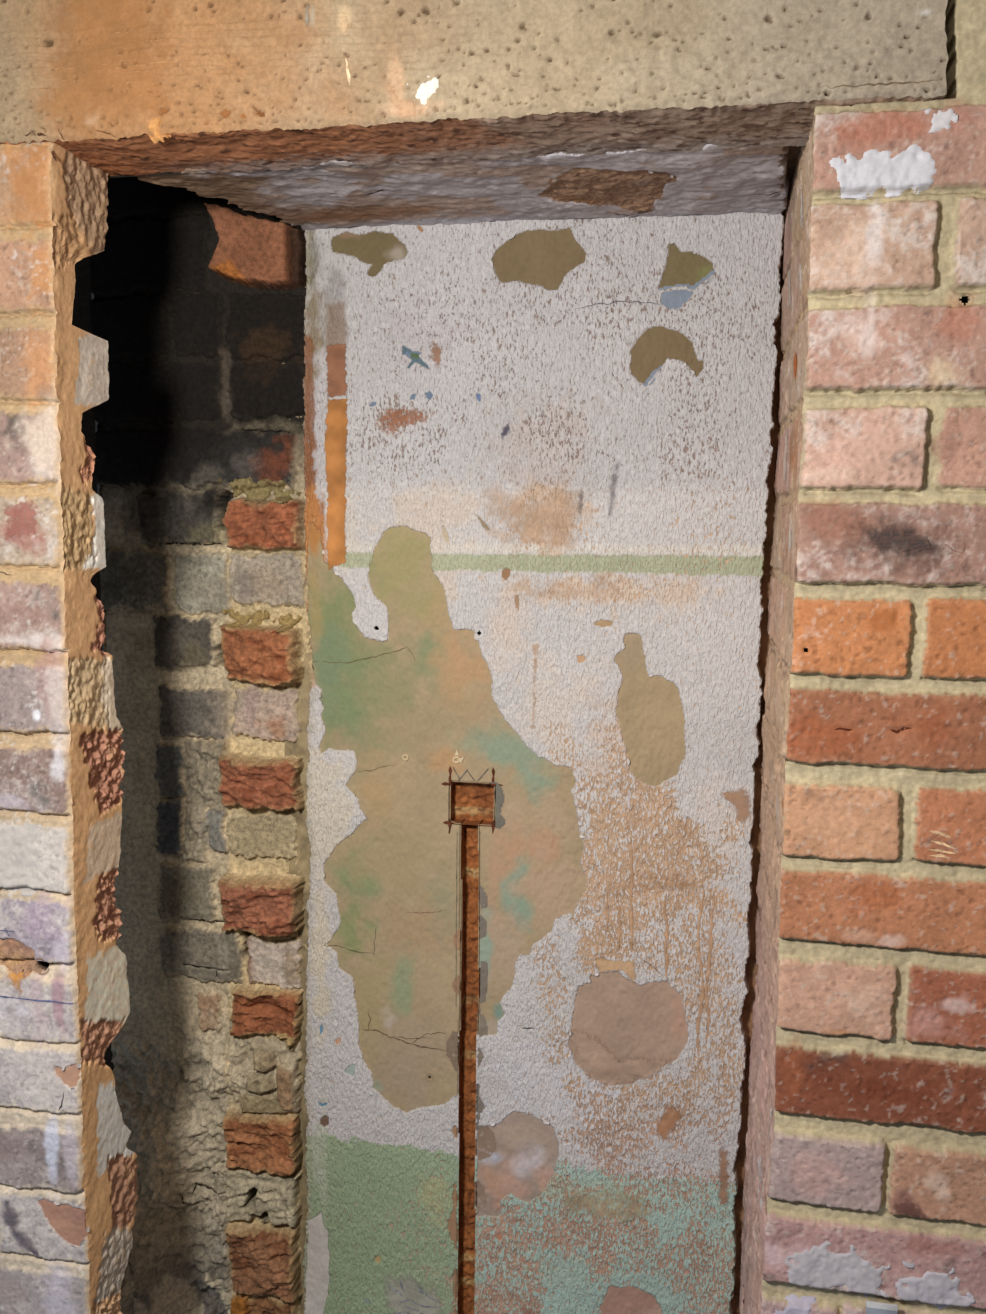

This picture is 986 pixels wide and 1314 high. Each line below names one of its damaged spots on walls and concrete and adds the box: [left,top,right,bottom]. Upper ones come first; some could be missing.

flaking render [539,168,677,212]
peeling [332,229,407,279]
peeling [490,228,586,290]
peeling [658,242,715,309]
peeling [630,326,703,387]
peeling [615,633,687,786]
peeling [307,522,587,1112]
peeling [568,958,688,1085]
peeling [477,1084,559,1216]
spalling [447,1183,457,1249]
peeling [600,1286,662,1314]